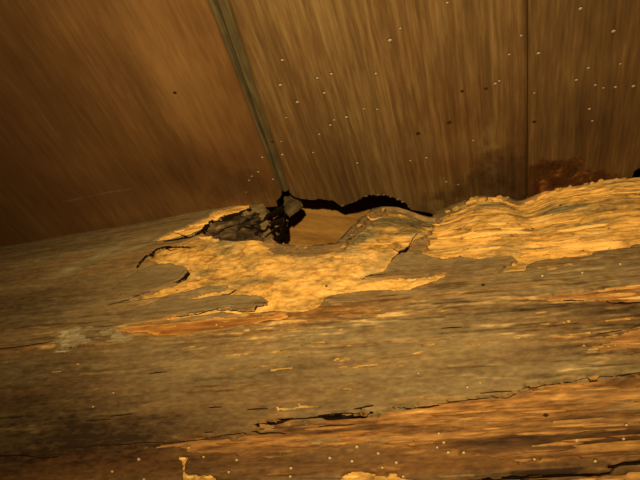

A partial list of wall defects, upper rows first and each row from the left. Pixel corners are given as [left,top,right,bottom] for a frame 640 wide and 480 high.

crack [136,191,289,268]
spalling [104,177,640,357]
crack [75,405,373,448]
crack [392,372,640,410]